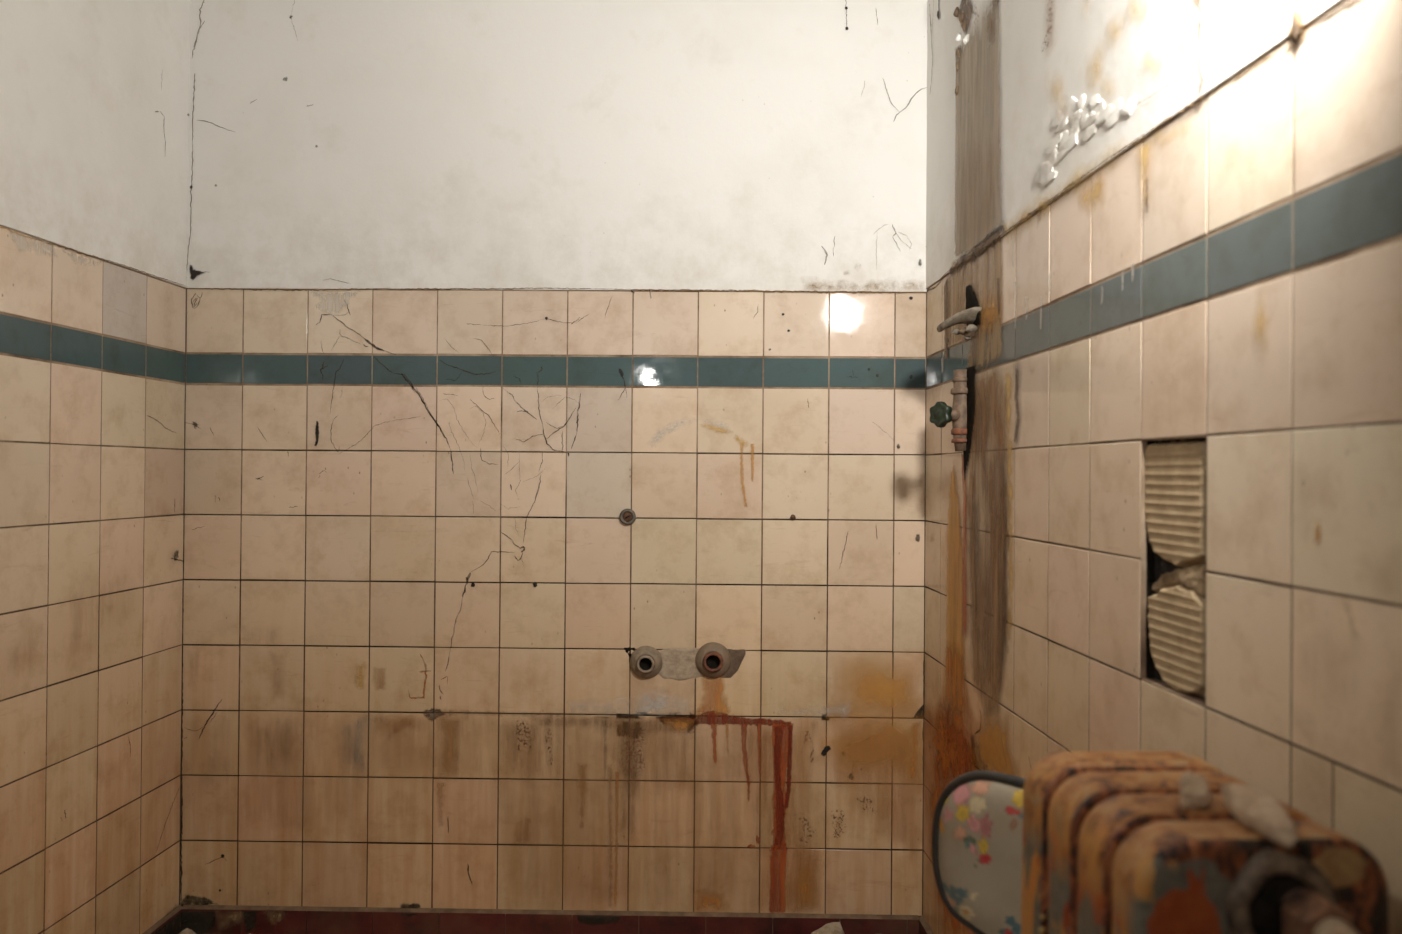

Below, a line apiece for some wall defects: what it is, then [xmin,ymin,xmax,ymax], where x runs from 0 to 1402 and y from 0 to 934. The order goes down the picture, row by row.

crack [0,0,1285,297]
flaking render [953,0,1001,256]
crack [1314,0,1357,24]
peeling [1145,438,1207,700]
leakage [578,728,645,925]
corrosion [659,678,801,913]
leakage [804,725,914,780]
corrosion [929,703,1014,818]